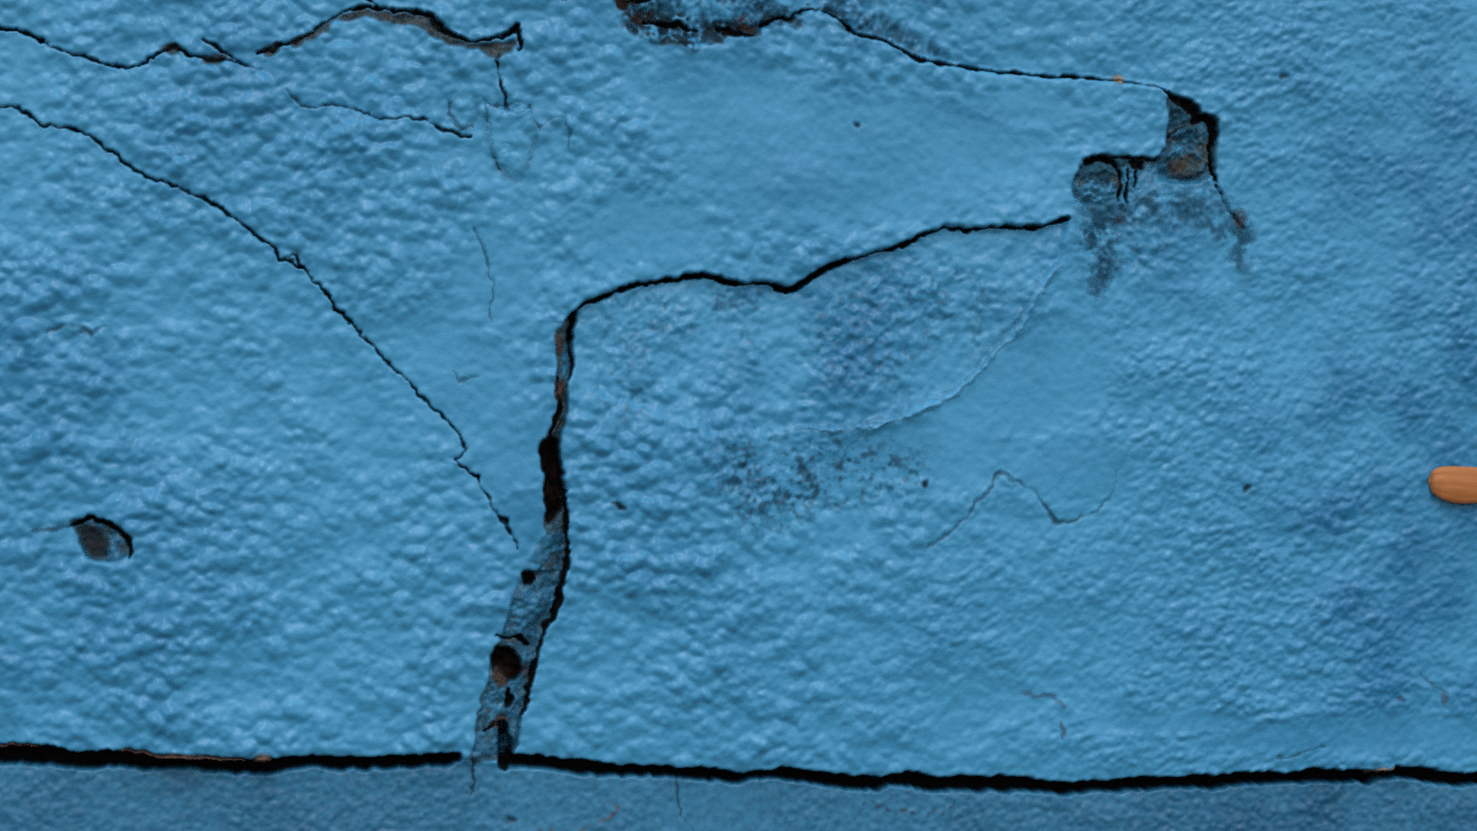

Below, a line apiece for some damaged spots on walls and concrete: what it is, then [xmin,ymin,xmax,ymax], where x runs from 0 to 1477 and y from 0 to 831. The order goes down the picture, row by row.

crack [0,0,523,109]
spalling [615,0,850,46]
crack [832,6,1171,97]
spalling [1073,96,1218,209]
crack [567,217,1070,318]
crack [2,104,516,541]
spalling [72,515,133,561]
spalling [470,316,575,762]
crack [0,725,1477,793]